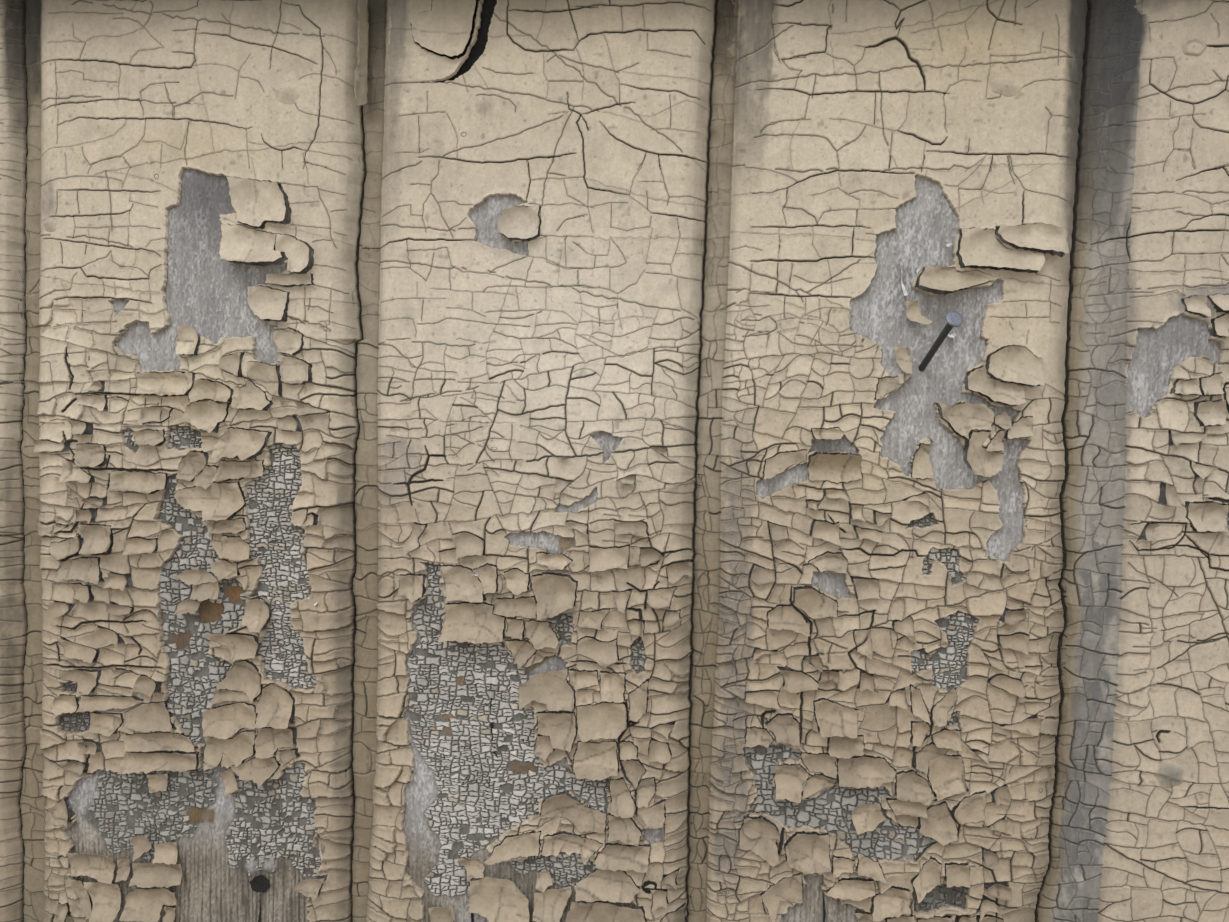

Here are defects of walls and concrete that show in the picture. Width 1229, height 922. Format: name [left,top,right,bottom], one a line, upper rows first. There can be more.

peeling [32,169,330,922]
crack [18,0,452,922]
peeling [469,195,541,256]
peeling [398,478,693,922]
crack [418,1,717,919]
peeling [767,551,880,637]
peeling [808,428,893,543]
peeling [739,611,1012,922]
peeling [849,176,1069,584]
crack [739,0,1229,922]
peeling [1124,294,1229,447]
peeling [1158,483,1229,532]